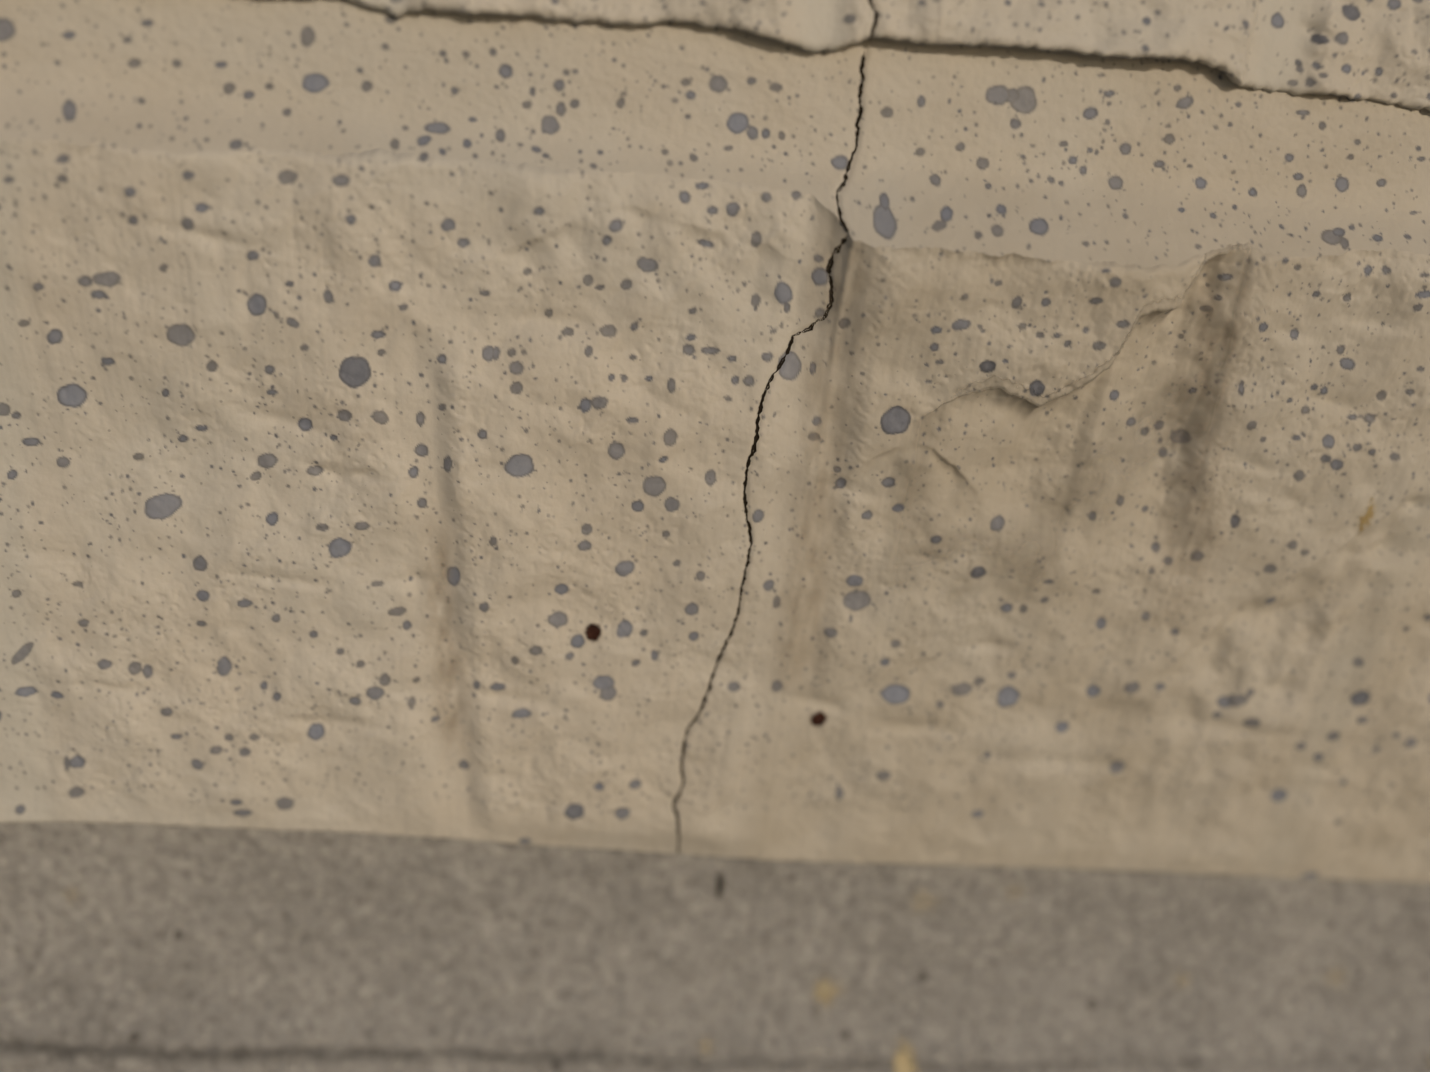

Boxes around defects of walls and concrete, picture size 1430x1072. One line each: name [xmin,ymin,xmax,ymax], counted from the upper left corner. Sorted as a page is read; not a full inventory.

crack [672,0,879,854]
spalling [898,243,1247,576]